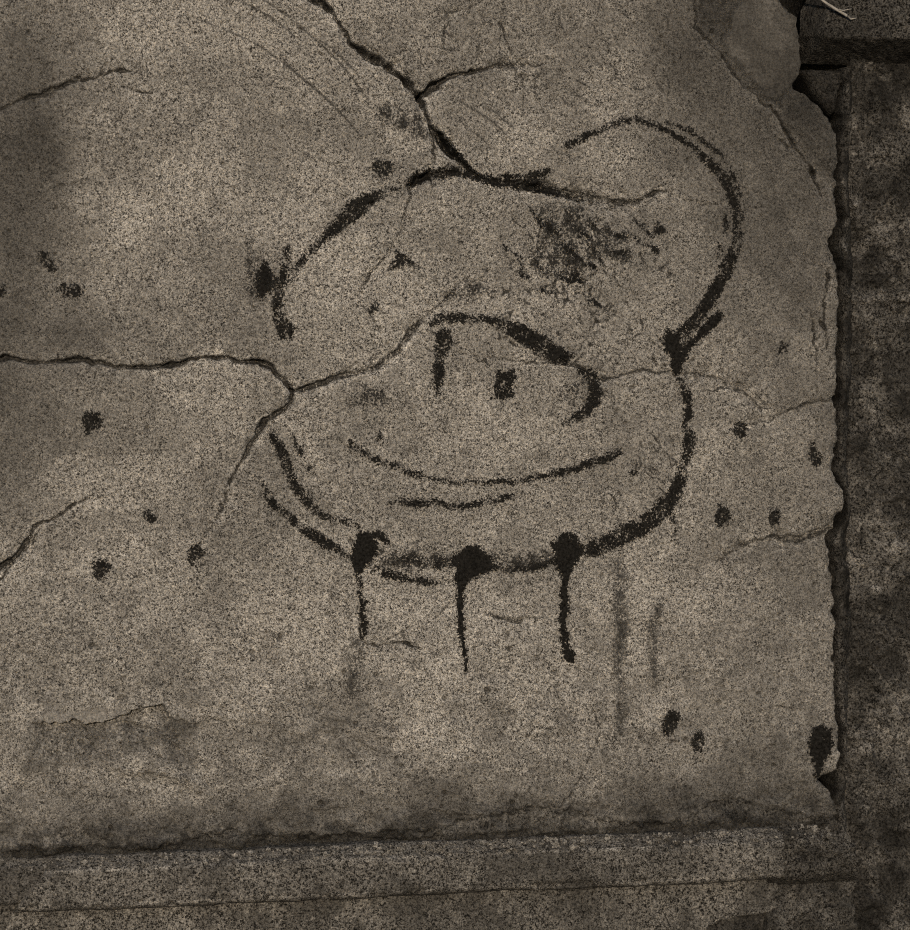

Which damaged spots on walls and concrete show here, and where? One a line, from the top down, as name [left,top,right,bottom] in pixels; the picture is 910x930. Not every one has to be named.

crack [0,0,830,547]
crack [720,527,832,561]
flaking render [31,703,191,764]